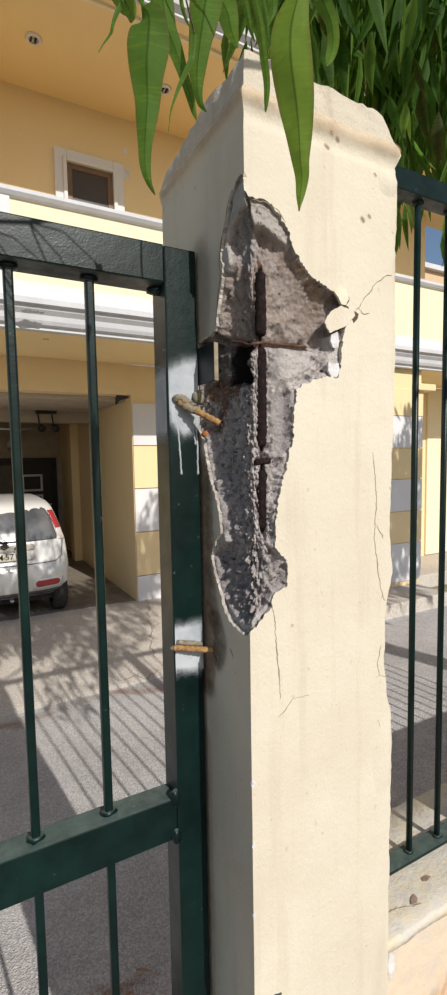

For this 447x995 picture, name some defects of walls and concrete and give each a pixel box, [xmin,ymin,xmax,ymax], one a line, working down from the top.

spalling [199,177,359,634]